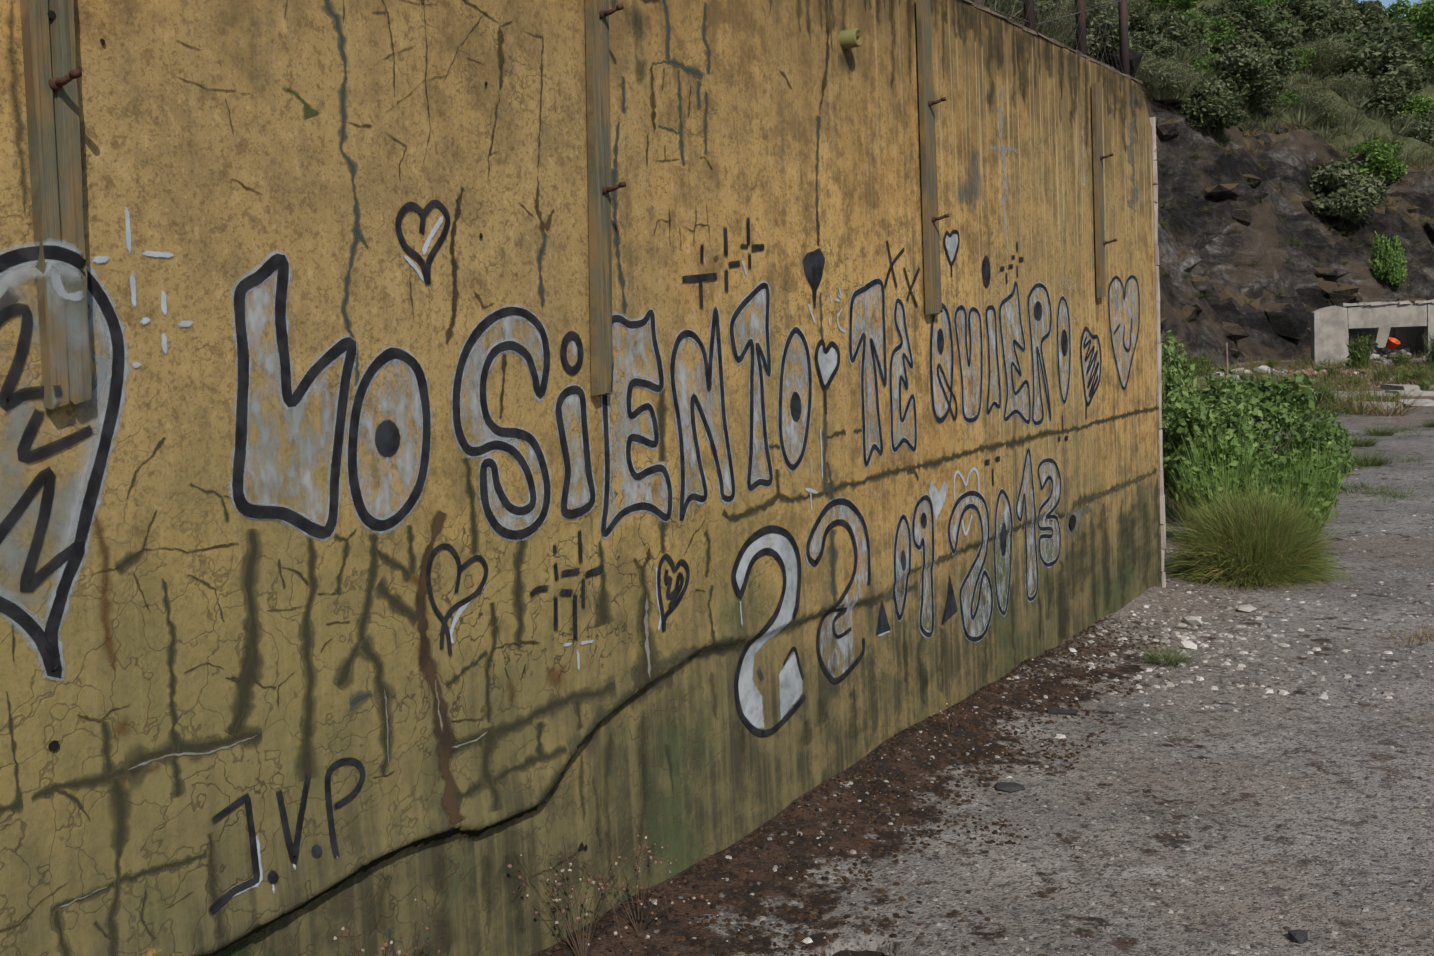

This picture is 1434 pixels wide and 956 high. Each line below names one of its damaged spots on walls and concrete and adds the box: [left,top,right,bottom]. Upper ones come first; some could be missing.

crack [177,40,251,132]
crack [230,179,263,195]
crack [324,0,554,419]
crack [611,0,713,315]
crack [780,0,830,245]
leakage [798,0,850,66]
leakage [864,0,911,88]
leakage [930,0,1142,239]
crack [817,292,825,339]
leakage [1039,482,1162,639]
crack [0,388,1159,956]